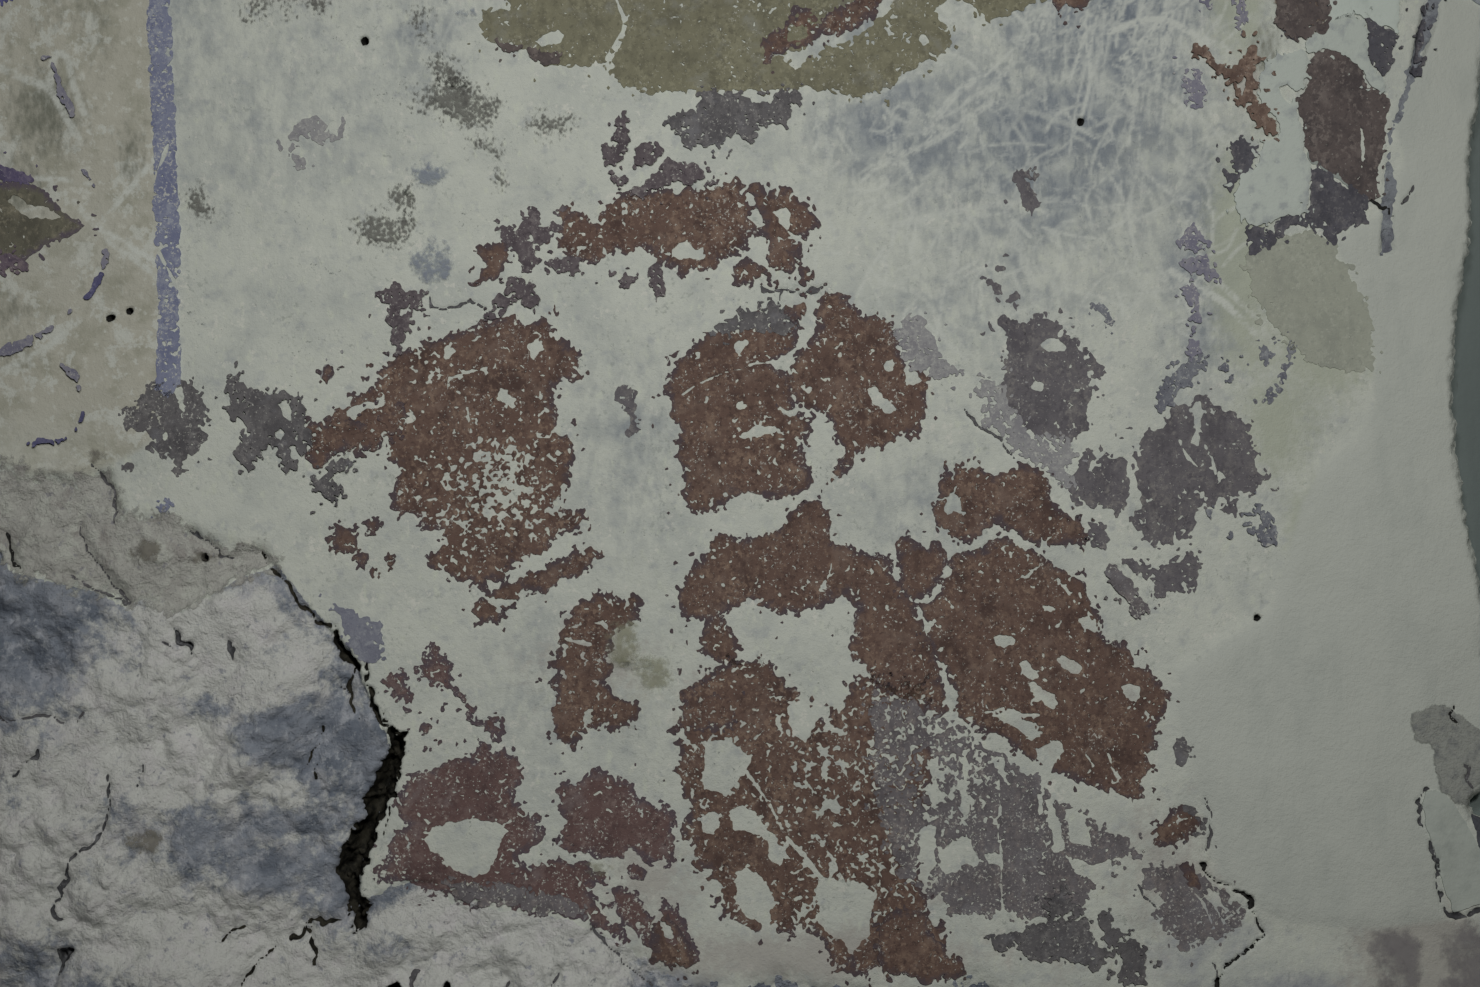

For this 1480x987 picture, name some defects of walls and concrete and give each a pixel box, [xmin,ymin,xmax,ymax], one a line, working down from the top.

peeling [479,0,959,158]
peeling [956,0,1090,29]
peeling [1191,30,1280,195]
peeling [1239,0,1446,404]
crack [6,532,21,569]
crack [71,463,131,606]
flaking render [0,110,1278,987]
crack [162,630,236,660]
crack [0,711,84,777]
crack [190,530,408,986]
crack [50,765,144,976]